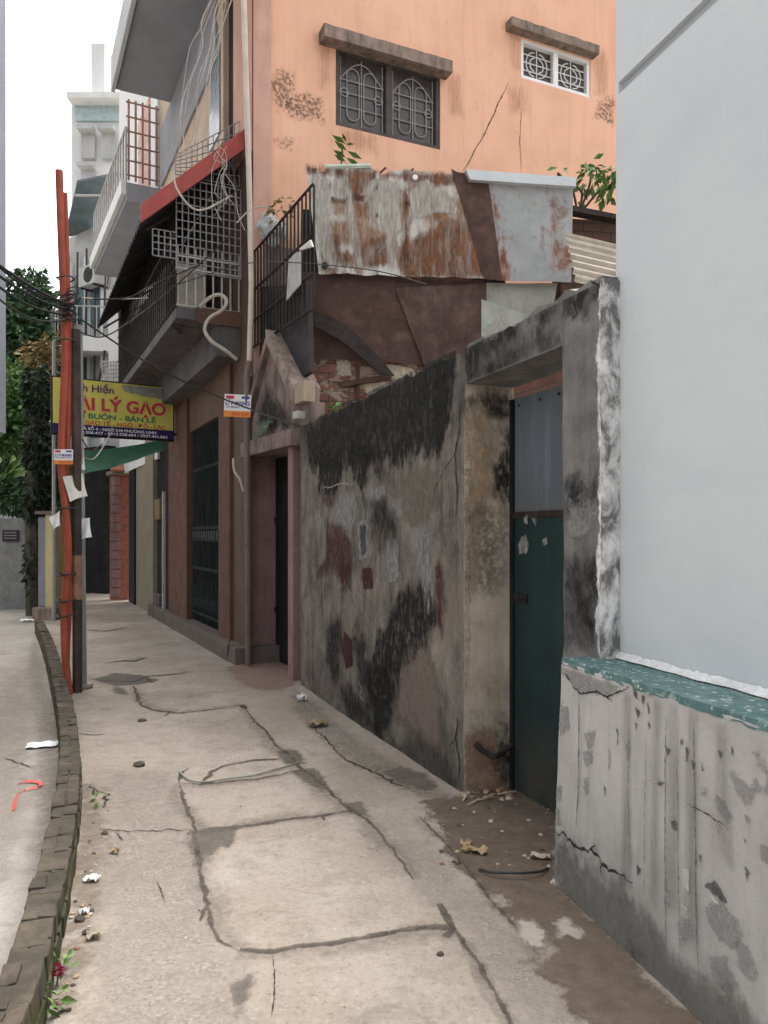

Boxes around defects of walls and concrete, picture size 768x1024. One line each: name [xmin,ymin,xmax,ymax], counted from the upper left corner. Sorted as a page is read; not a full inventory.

water stain [271,70,324,120]
crack [463,86,507,170]
rust [306,165,484,279]
spalling [314,358,351,376]
spalling [361,364,423,395]
water stain [306,288,598,503]
water stain [325,583,456,787]
crack [89,657,513,1024]
crack [420,817,539,955]
crack [555,674,727,960]
water stain [555,836,749,1024]
peeling [705,881,758,990]